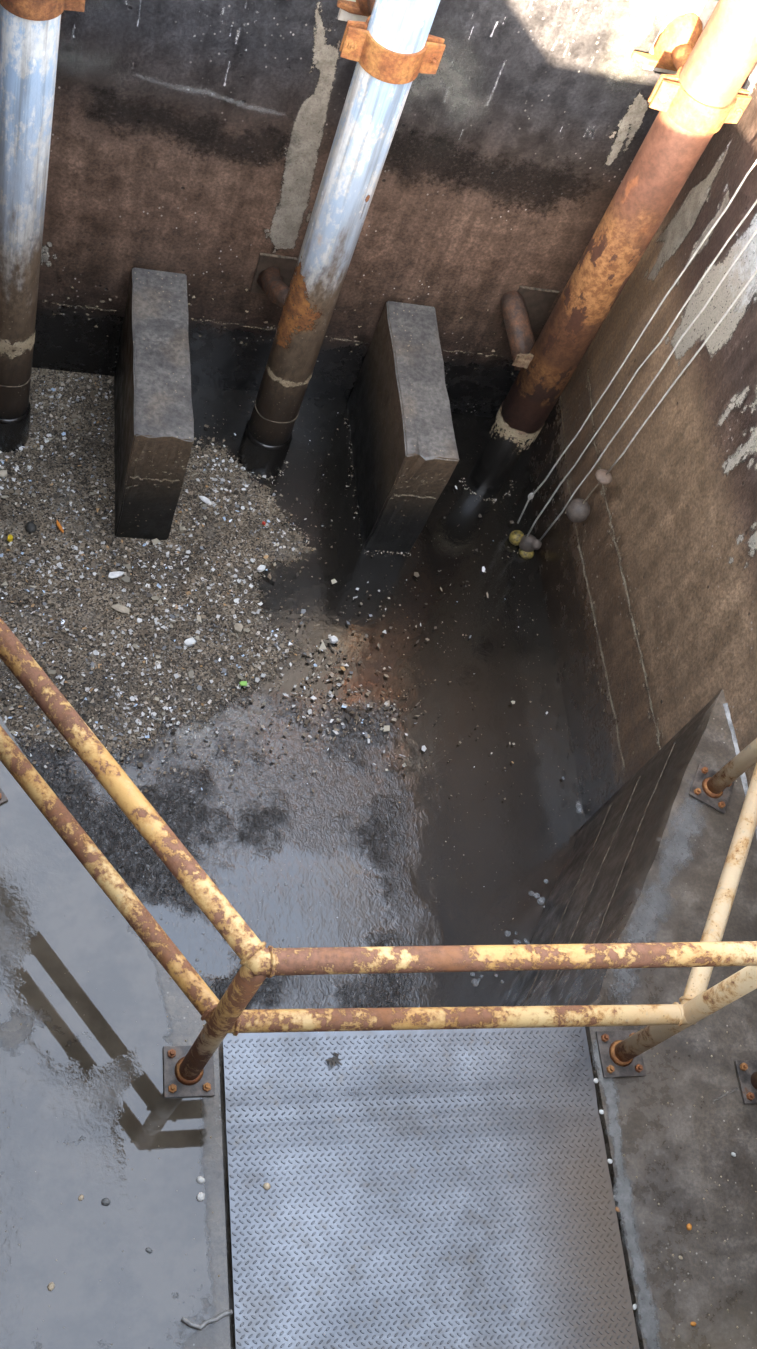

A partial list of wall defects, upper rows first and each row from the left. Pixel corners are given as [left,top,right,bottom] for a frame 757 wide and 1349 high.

damp [89,88,295,167]
damp [384,32,594,210]
damp [40,242,57,267]
peeling [644,141,757,366]
peeling [718,386,757,474]